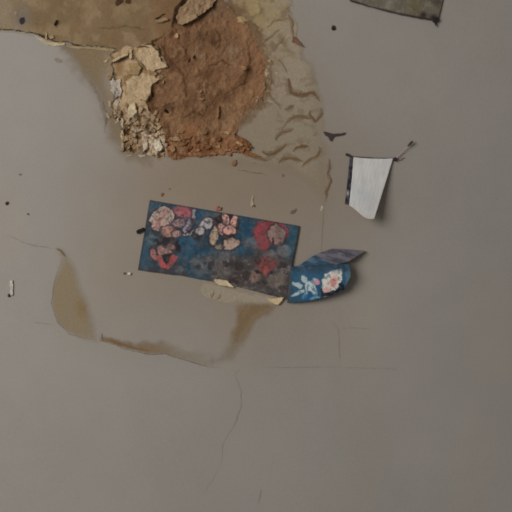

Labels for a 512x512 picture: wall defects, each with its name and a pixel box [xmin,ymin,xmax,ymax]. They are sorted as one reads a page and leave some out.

flaking render [0,0,323,177]